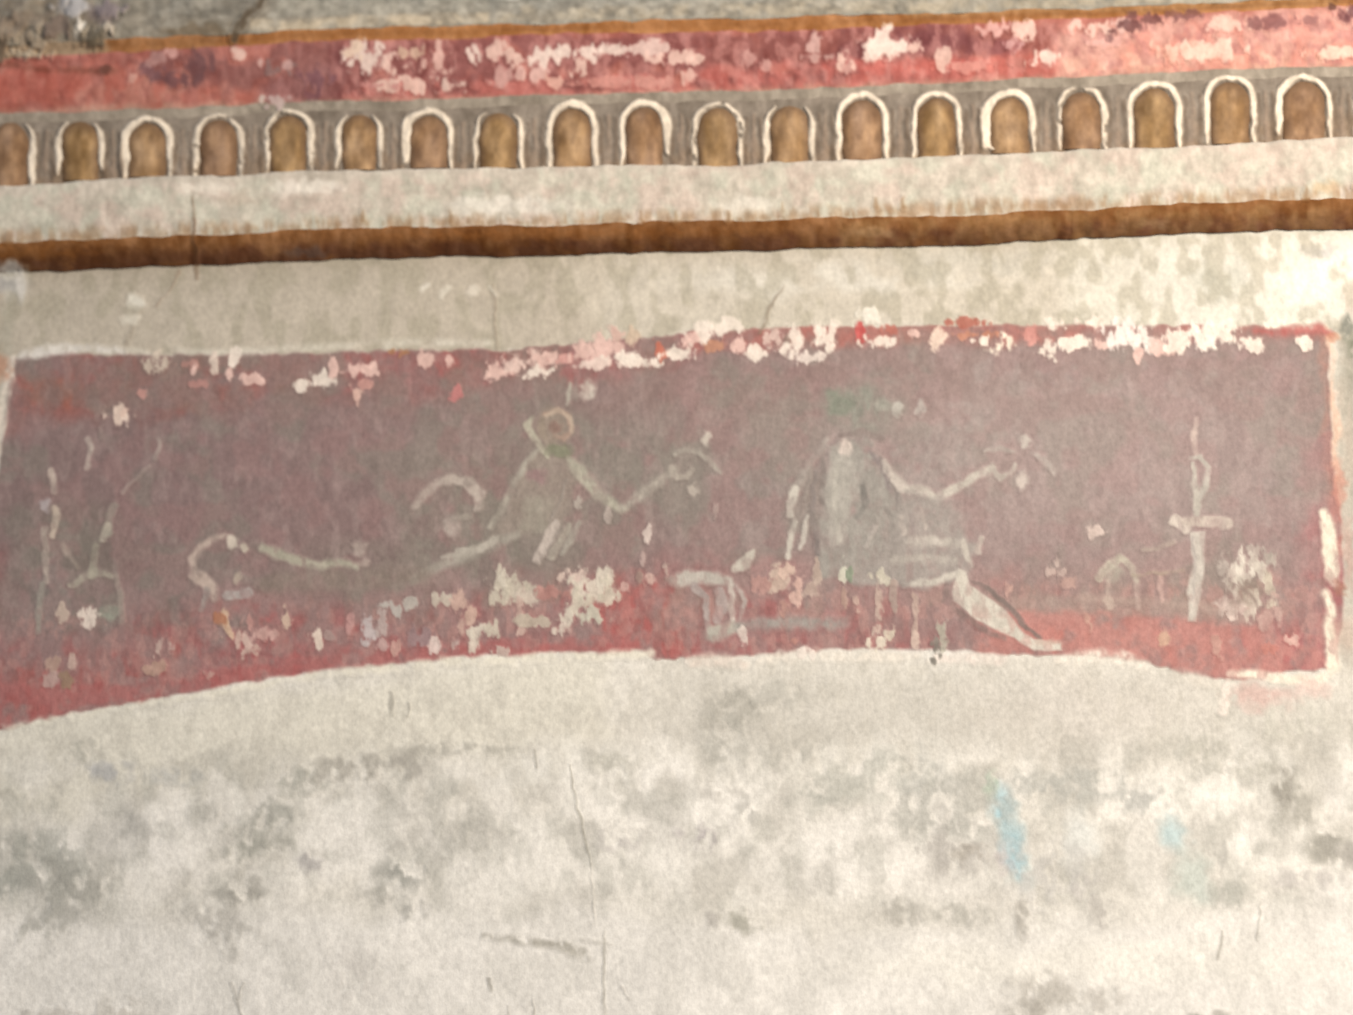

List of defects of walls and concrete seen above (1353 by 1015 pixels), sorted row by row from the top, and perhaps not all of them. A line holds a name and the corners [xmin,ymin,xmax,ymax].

spalling [0,0,132,67]
peeling [338,32,706,98]
peeling [737,45,773,74]
peeling [798,15,1062,79]
peeling [1066,16,1126,53]
peeling [1147,12,1254,67]
peeling [1299,42,1353,63]
peeling [482,304,1325,385]
peeling [290,347,466,409]
peeling [212,520,671,662]
peeling [735,624,750,648]